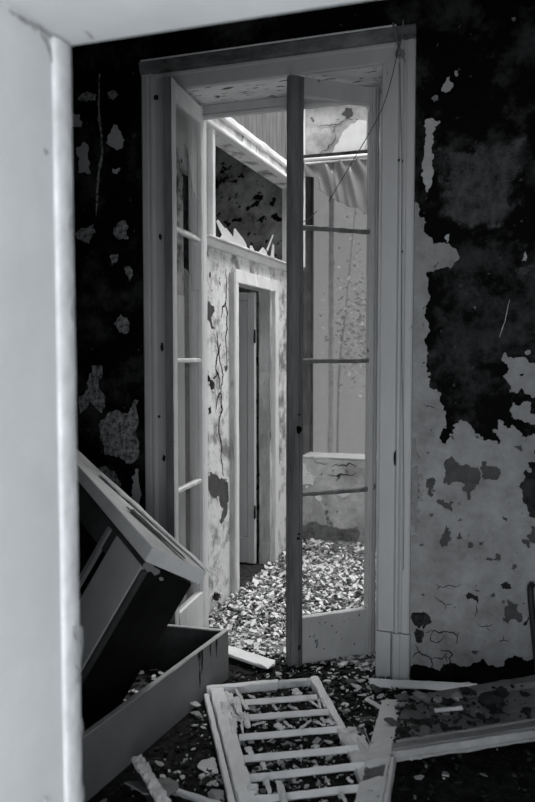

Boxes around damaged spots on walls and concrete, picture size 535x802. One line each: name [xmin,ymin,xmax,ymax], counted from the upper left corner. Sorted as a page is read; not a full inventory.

peeling [431,71,458,102]
peeling [106,124,124,150]
peeling [421,118,440,192]
peeling [113,220,129,240]
peeling [114,315,130,334]
spalling [207,301,215,329]
crack [213,269,228,476]
peeling [78,365,142,504]
peeling [410,202,535,671]
crack [314,460,355,481]
spalling [208,472,229,524]
crack [413,630,458,676]